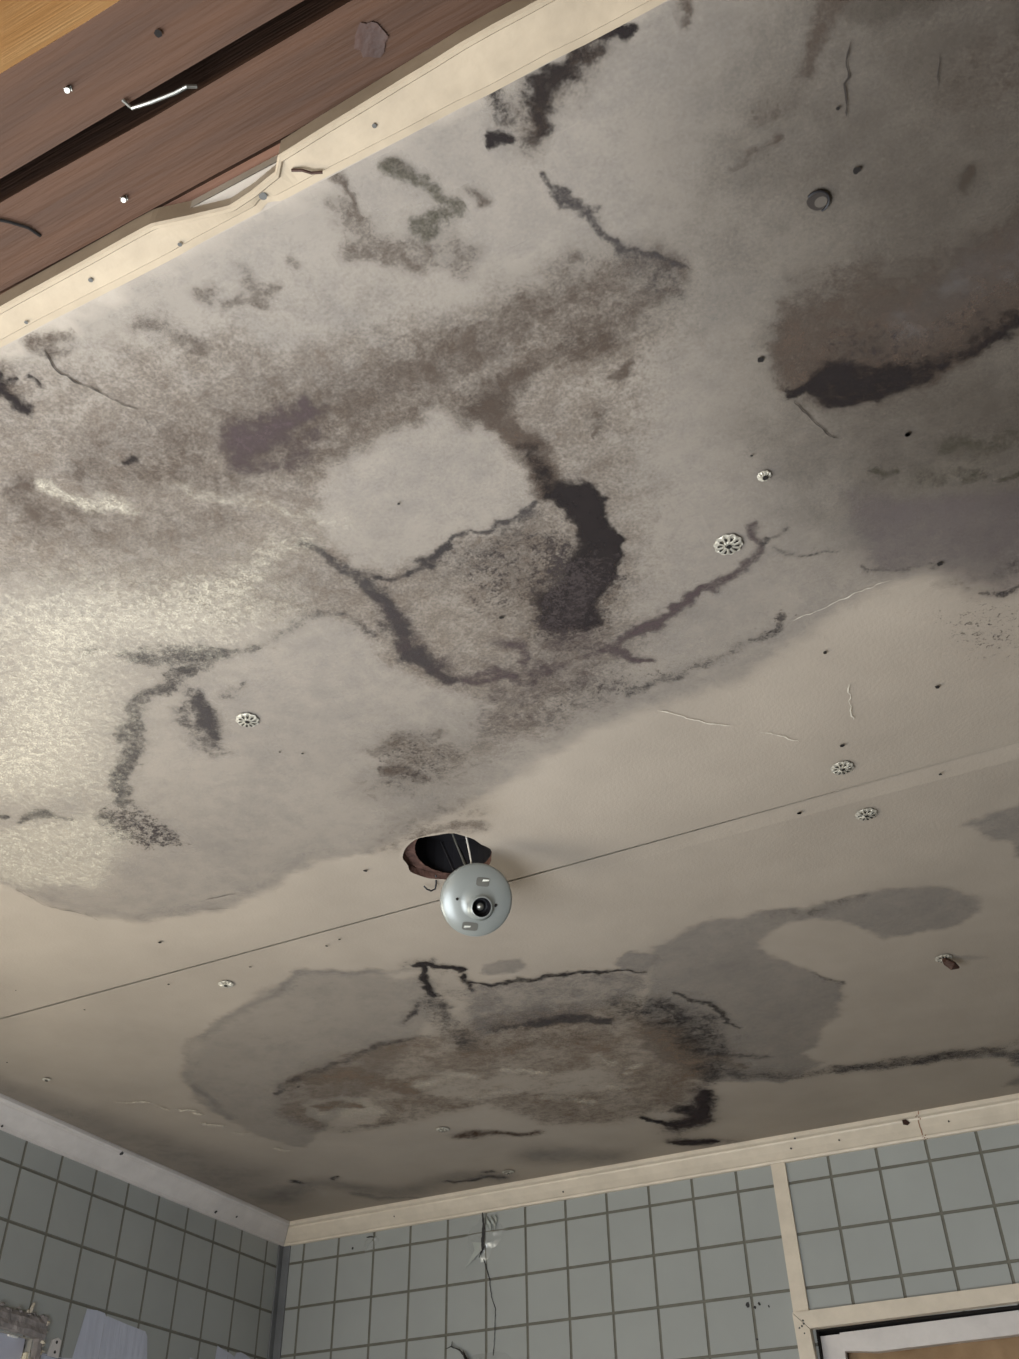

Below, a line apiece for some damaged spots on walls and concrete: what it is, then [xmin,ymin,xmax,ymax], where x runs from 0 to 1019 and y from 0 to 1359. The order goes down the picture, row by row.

water stain [485,24,638,149]
water stain [772,213,1019,408]
water stain [0,159,769,730]
water stain [0,809,68,824]
water stain [97,645,259,849]
water stain [273,955,1019,1146]